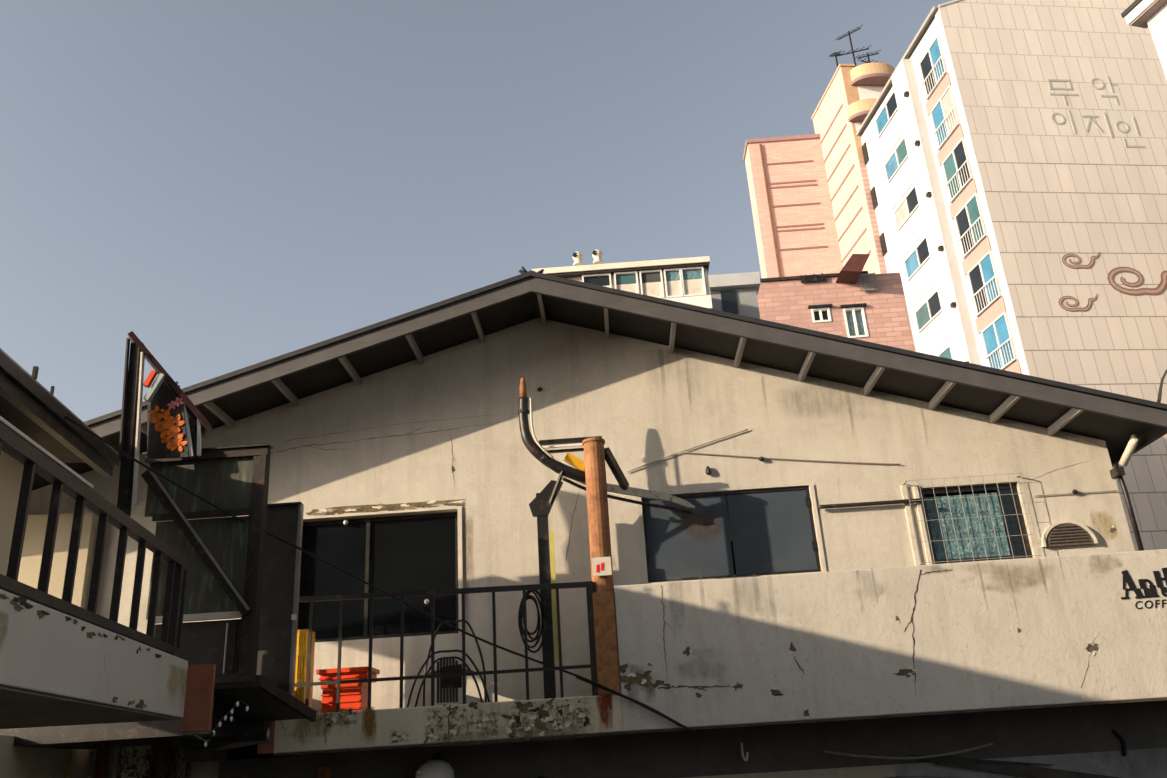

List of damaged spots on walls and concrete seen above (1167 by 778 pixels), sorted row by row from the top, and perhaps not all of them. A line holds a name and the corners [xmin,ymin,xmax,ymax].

crack [272,414,499,487]
peeling [0,594,50,619]
peeling [66,616,126,641]
crack [903,570,951,694]
peeling [619,663,670,691]
peeling [424,698,590,744]
corrosion [597,695,612,724]